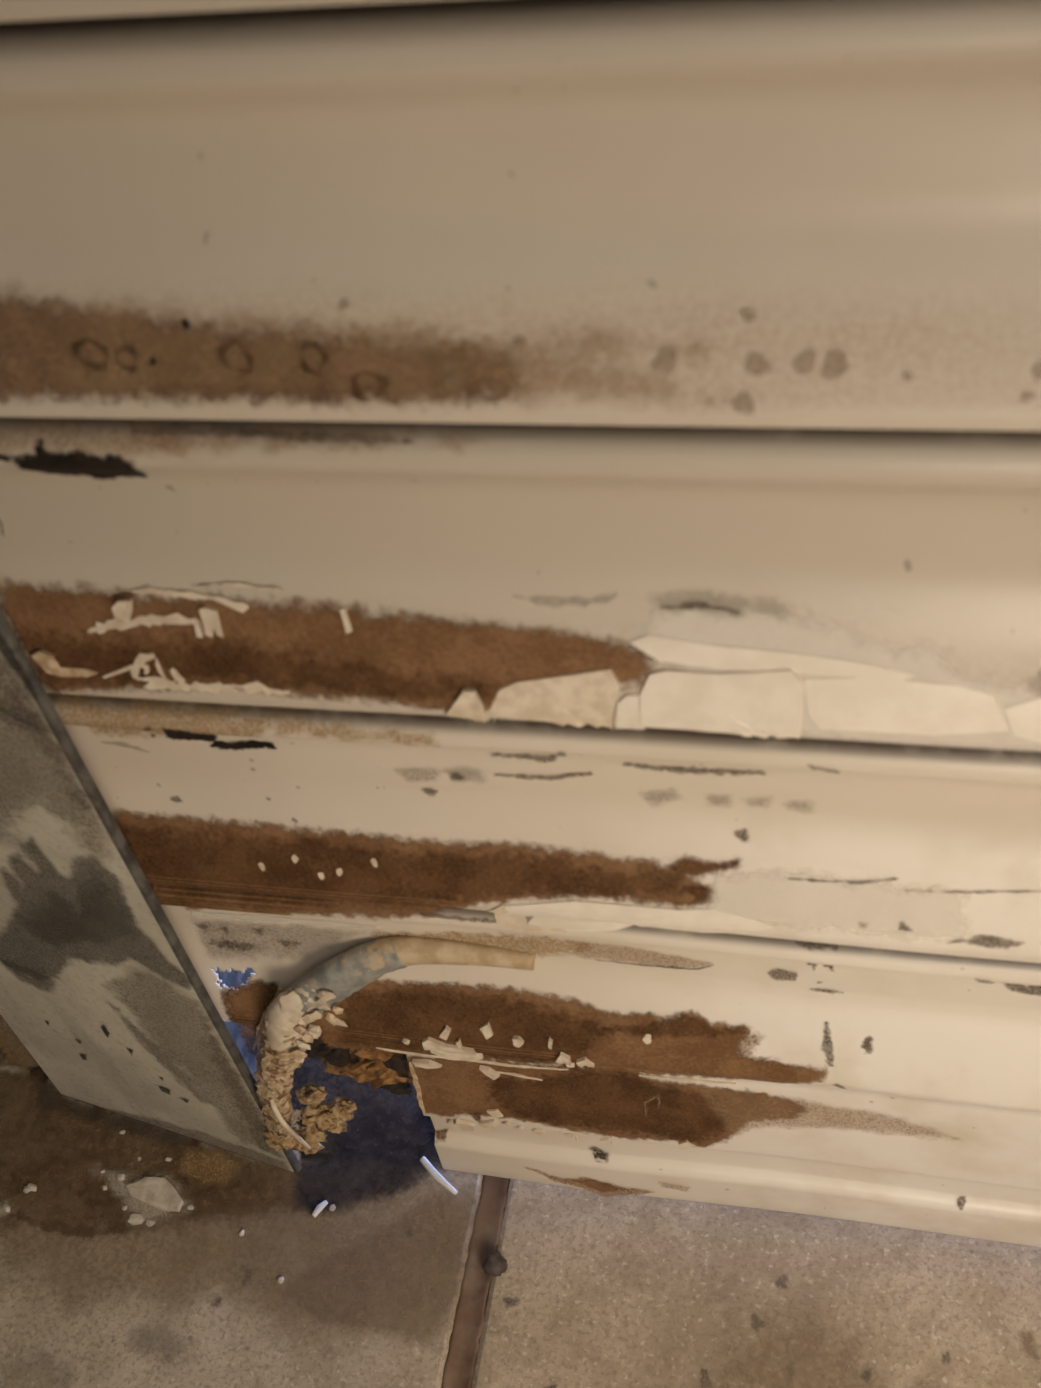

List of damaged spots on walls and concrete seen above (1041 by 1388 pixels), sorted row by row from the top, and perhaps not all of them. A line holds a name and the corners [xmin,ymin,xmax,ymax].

corrosion [0,299,621,405]
peeling [0,636,290,699]
peeling [87,582,284,638]
corrosion [0,581,651,738]
peeling [339,608,353,634]
peeling [427,634,1041,743]
corrosion [113,811,738,970]
water stain [4,961,51,991]
corrosion [221,980,282,1060]
peeling [279,990,348,1063]
corrosion [261,980,930,1155]
water stain [0,1019,473,1339]